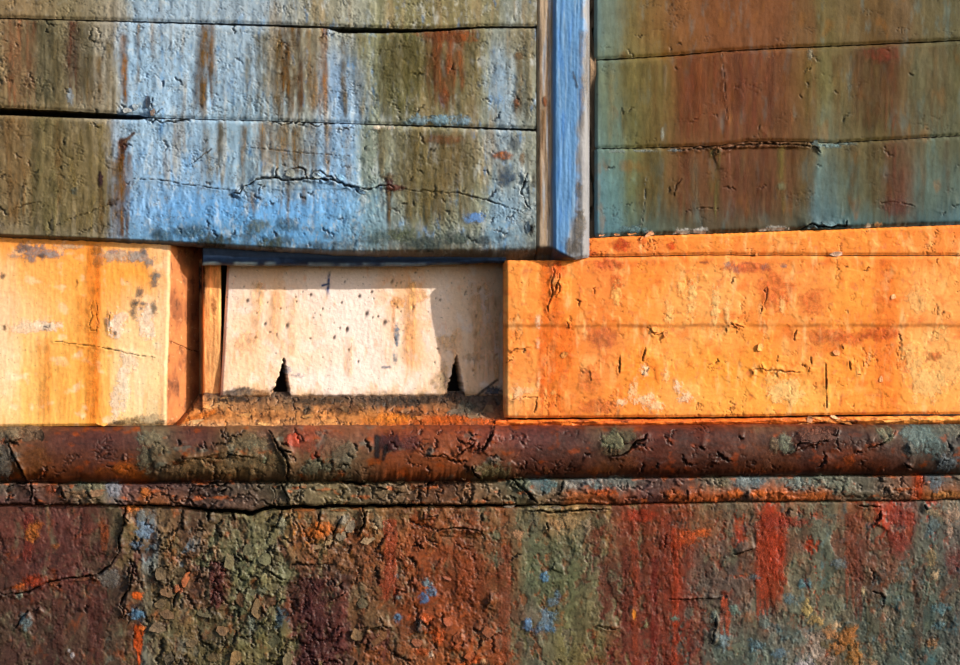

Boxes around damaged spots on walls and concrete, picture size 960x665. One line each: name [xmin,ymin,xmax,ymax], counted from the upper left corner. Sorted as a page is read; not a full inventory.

water stain [383,33,451,115]
crack [134,149,382,194]
water stain [371,132,490,251]
crack [677,143,822,155]
water stain [154,226,231,248]
rust [374,435,419,461]
peeling [770,415,857,454]
peeling [876,417,960,493]
rust [728,489,767,499]
crack [5,508,133,628]
peeling [131,567,190,633]
rust [755,511,802,618]